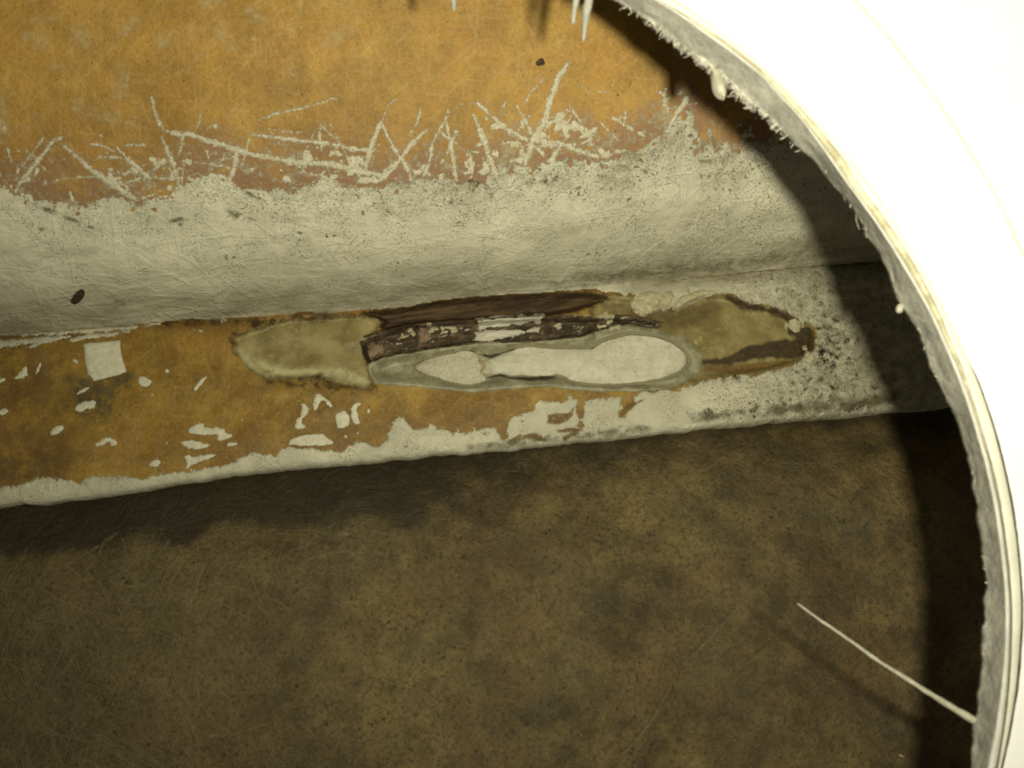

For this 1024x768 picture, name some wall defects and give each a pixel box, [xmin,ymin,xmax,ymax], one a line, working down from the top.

corrosion [362,291,609,333]
peeling [630,289,716,317]
peeling [0,322,162,350]
peeling [784,316,813,361]
peeling [0,363,41,383]
peeling [75,387,96,412]
peeling [138,376,153,396]
peeling [289,394,370,446]
peeling [95,437,117,447]
peeling [166,422,237,469]